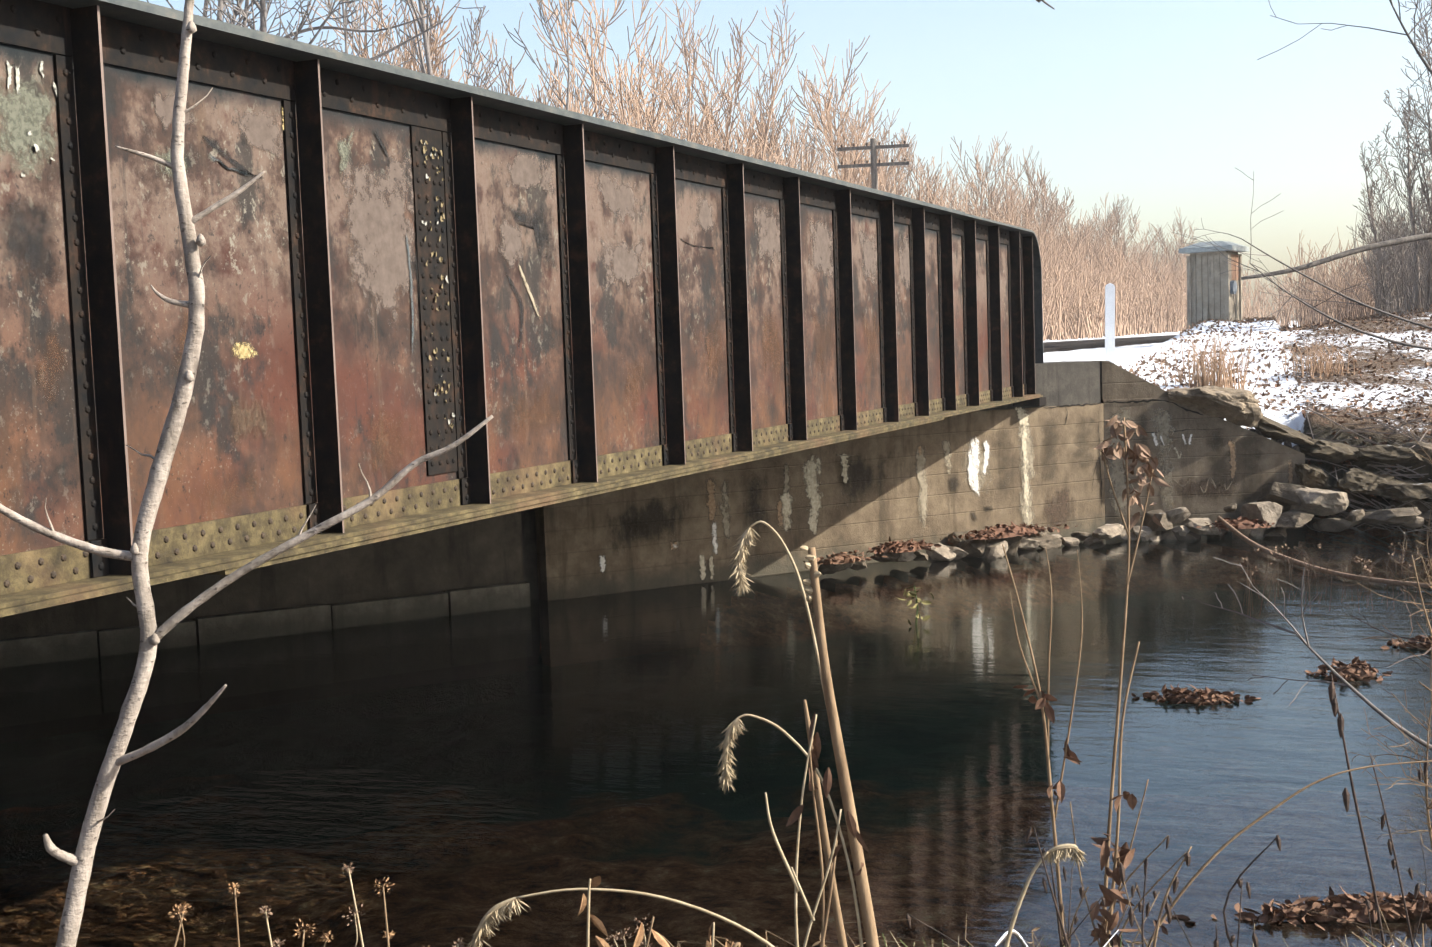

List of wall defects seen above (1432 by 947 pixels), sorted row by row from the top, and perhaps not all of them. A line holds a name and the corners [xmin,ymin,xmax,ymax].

peeling [154,94,194,128]
corrosion [204,136,261,178]
peeling [239,111,282,158]
corrosion [7,202,53,279]
corrosion [509,207,555,267]
corrosion [507,275,524,344]
water stain [802,455,823,534]
water stain [837,454,889,504]
efflorescence [915,446,927,525]
efflorescence [968,439,990,495]
water stain [1015,407,1070,529]
water stain [600,499,679,572]